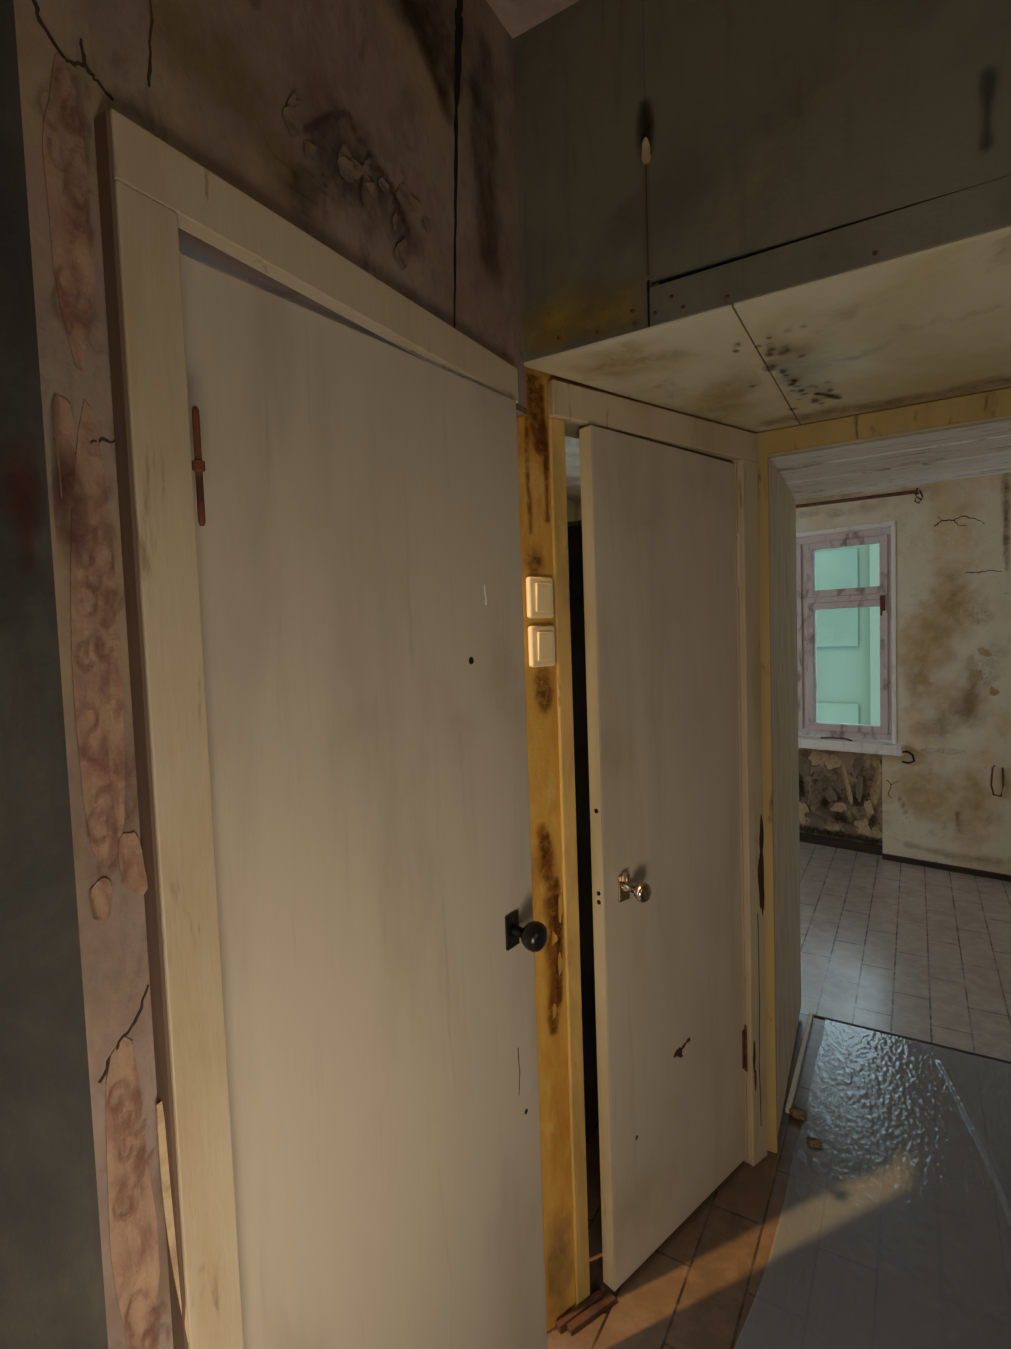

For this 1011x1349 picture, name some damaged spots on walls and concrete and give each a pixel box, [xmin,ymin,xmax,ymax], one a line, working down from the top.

crack [453,0,463,328]
leakage [756,337,841,420]
peeling [799,750,883,840]
peeling [90,832,148,921]